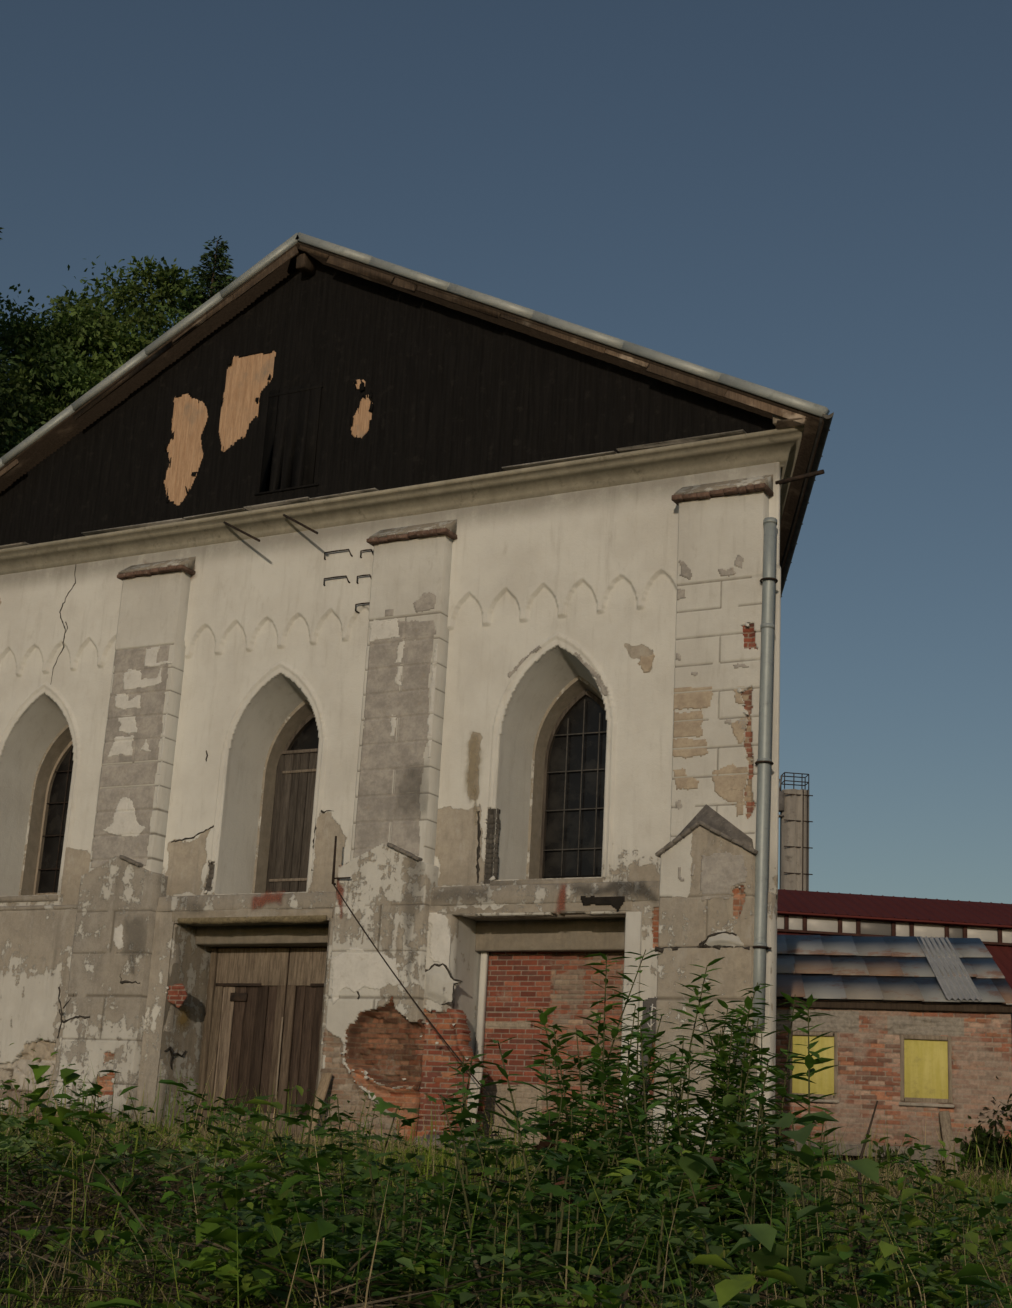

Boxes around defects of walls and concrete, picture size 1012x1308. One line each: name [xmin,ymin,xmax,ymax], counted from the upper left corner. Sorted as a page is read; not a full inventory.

peeling [164,351,276,506]
peeling [350,379,373,438]
peeling [677,560,692,600]
peeling [718,555,744,577]
crack [50,566,76,685]
flaking render [638,653,655,673]
spalling [733,621,758,669]
peeling [91,644,172,868]
peeling [672,653,756,819]
spalling [0,1039,57,1115]
spalling [340,996,488,1144]